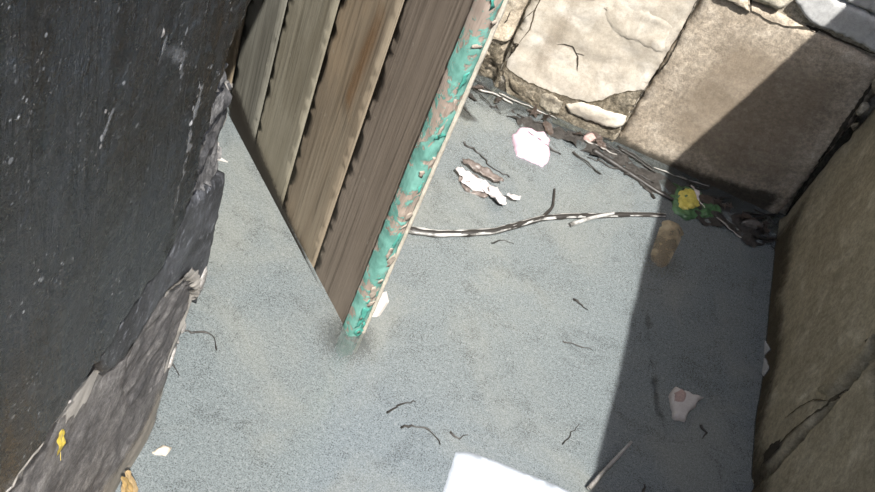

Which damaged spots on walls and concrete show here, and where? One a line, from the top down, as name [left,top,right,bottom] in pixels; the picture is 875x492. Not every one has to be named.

spalling [193,38,234,192]
peeling [416,157,437,195]
peeling [354,212,413,338]
peeling [122,266,208,406]
peeling [53,370,100,424]
crack [780,390,848,443]
peeling [5,443,43,492]